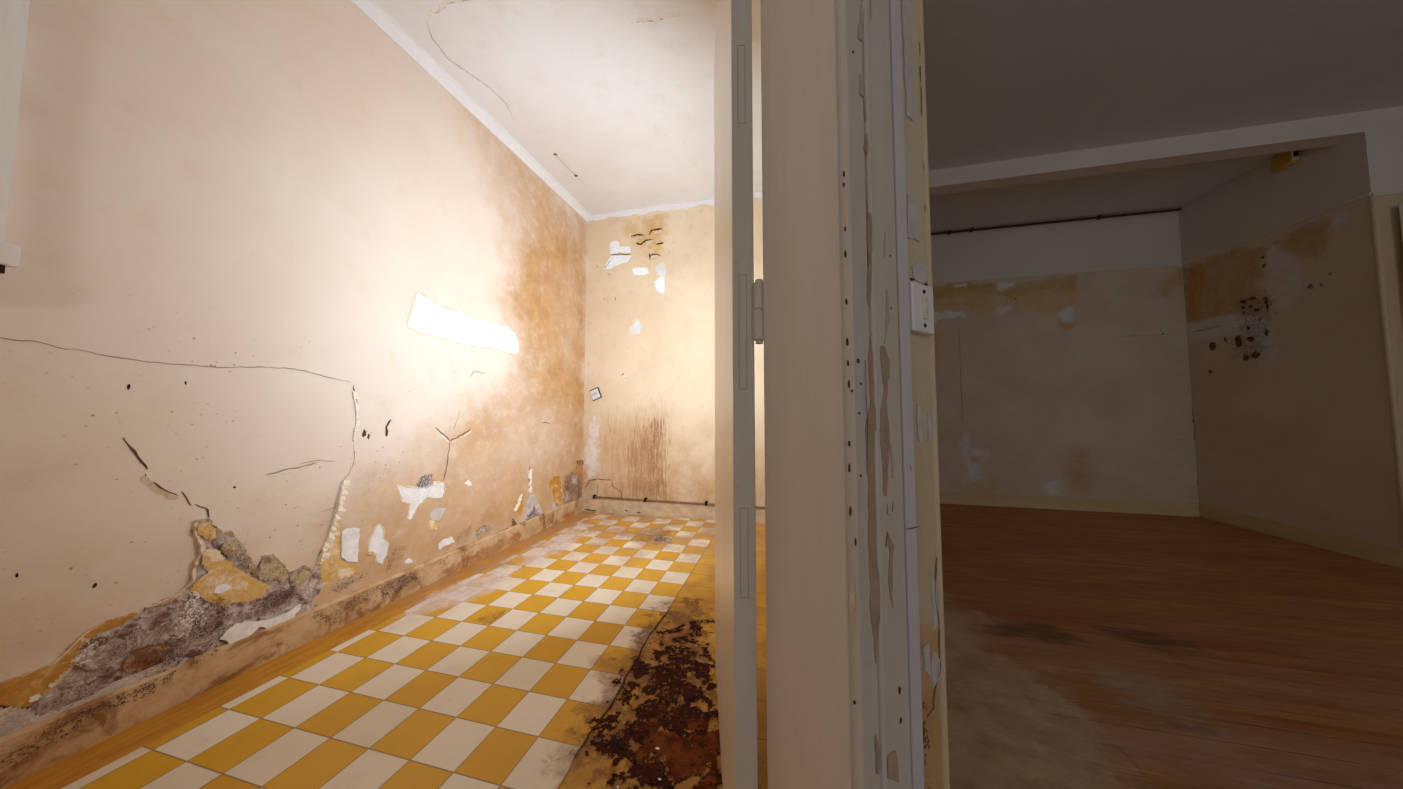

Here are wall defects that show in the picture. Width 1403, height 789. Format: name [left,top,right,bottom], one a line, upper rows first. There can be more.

flaking render [604,241,668,293]
flaking render [406,291,520,355]
water stain [247,64,687,628]
water stain [932,273,1088,382]
crack [0,337,360,566]
peeling [395,474,455,549]
flaking render [476,468,563,539]
flaking render [0,517,389,738]
water stain [0,671,176,769]